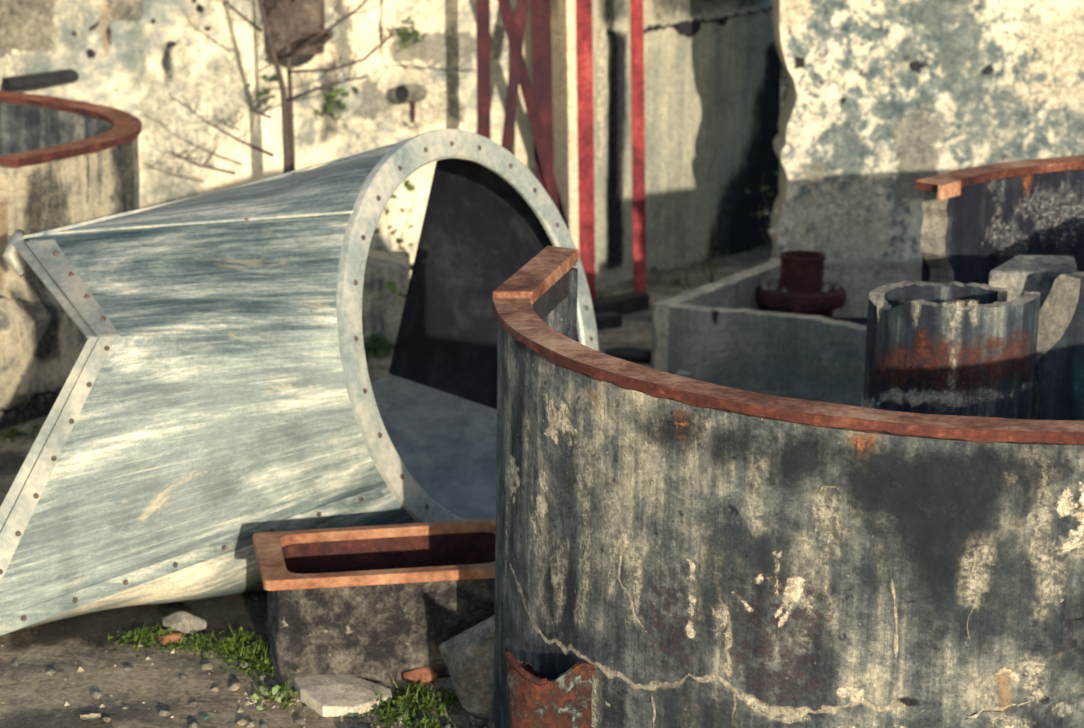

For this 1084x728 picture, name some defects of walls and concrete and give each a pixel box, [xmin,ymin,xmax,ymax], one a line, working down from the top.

spalling [0,0,57,78]
rust [878,331,1030,392]
leakage [604,487,642,613]
crack [616,533,643,627]
crack [509,550,906,728]
leakage [651,497,834,702]
peeling [773,552,805,627]
leakage [640,416,1072,646]
crack [965,700,1042,720]
leakage [1023,662,1044,695]
spalling [1022,579,1084,718]
peeling [1054,482,1084,553]